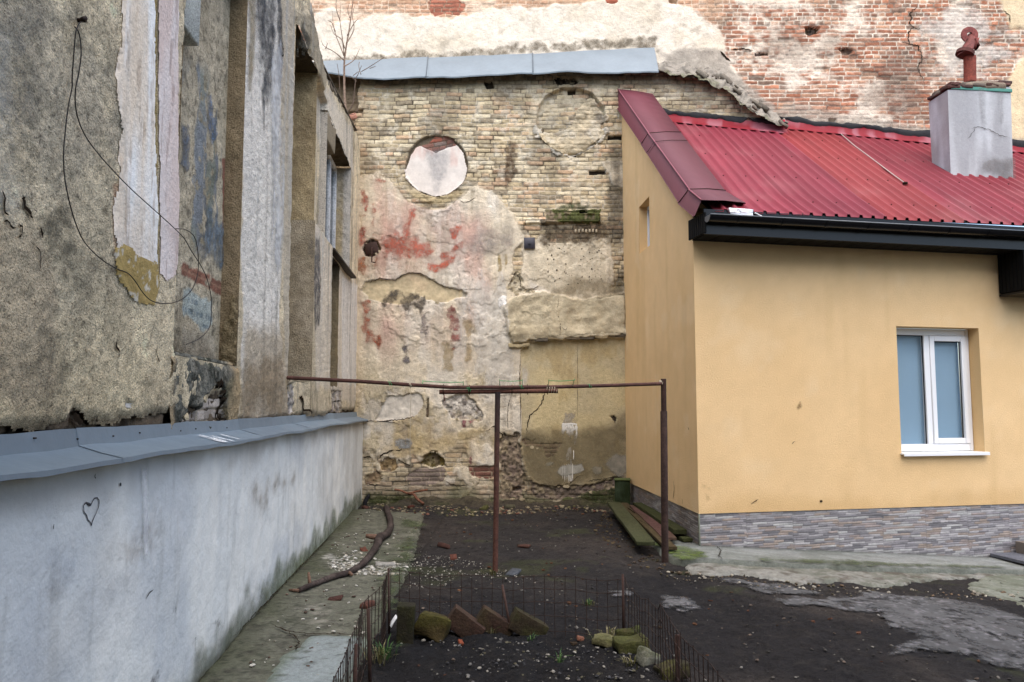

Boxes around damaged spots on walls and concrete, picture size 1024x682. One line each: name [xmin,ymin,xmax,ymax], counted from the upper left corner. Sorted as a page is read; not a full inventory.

crack [905,4,925,85]
peeling [361,273,467,305]
spalling [506,271,538,295]
spalling [179,388,226,422]
peeling [374,393,424,422]
peeling [442,394,483,422]
crack [486,356,545,436]
spalling [364,470,383,485]
flaking render [407,451,448,486]
flaking render [468,432,617,501]